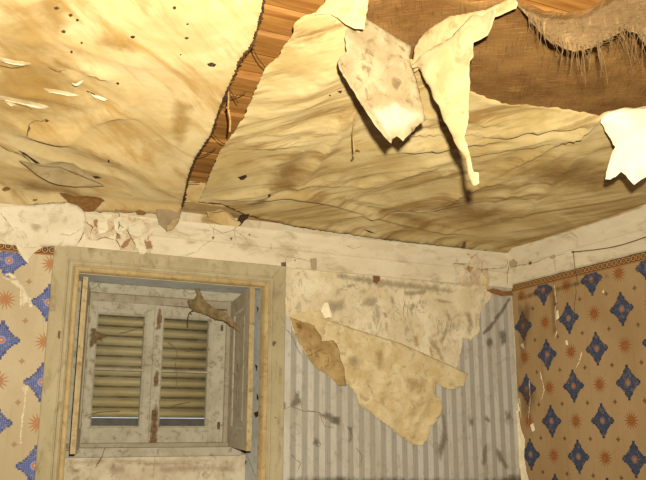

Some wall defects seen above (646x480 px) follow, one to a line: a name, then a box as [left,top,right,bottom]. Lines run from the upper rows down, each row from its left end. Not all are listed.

peeling [0,202,155,263]
leakage [363,279,443,314]
leakage [284,391,353,442]